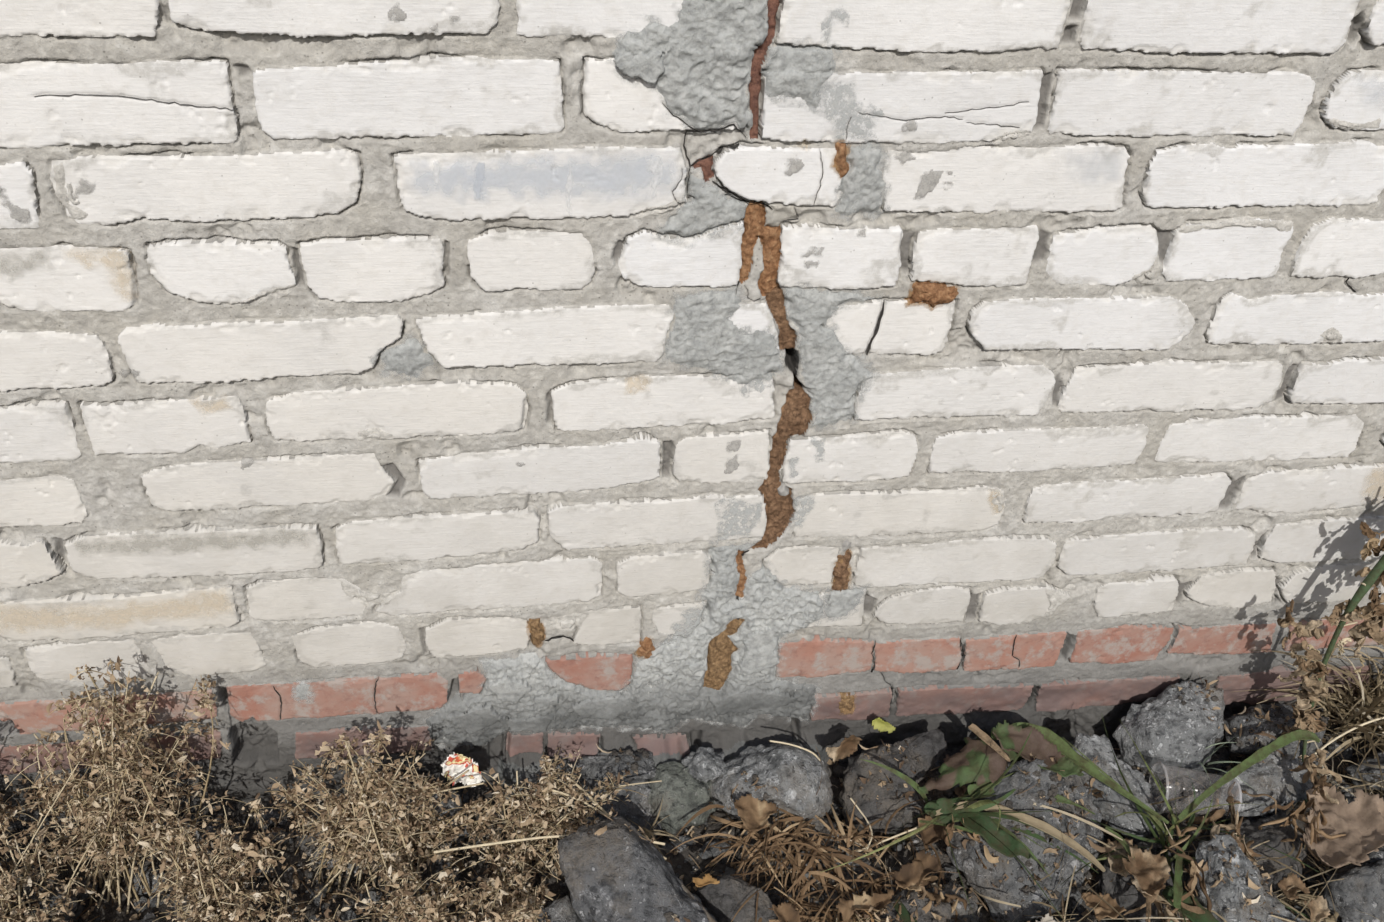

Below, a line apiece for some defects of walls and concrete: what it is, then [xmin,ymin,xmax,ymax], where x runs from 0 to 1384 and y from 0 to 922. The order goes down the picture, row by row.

spalling [549,611,591,634]
crack [663,0,1029,690]